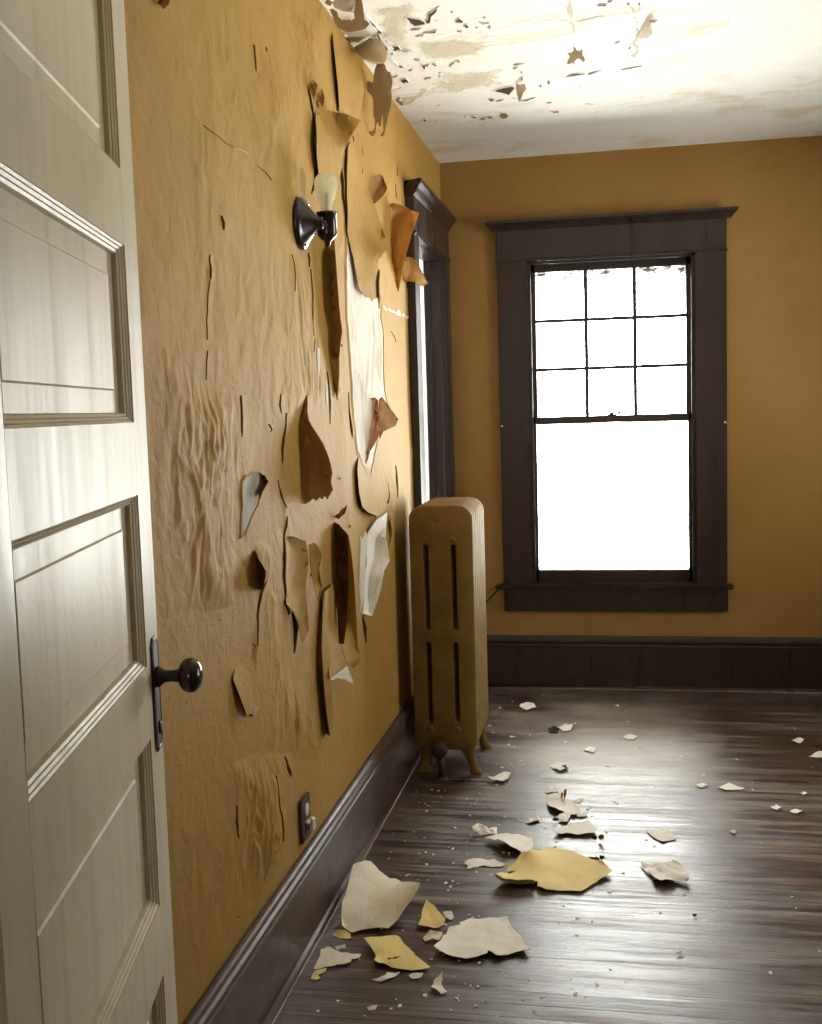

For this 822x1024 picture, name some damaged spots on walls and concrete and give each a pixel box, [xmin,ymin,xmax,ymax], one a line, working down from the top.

spalling [404,5,491,37]
spalling [389,44,461,84]
spalling [464,63,561,121]
spalling [567,47,585,65]
crack [203,125,277,184]
crack [206,255,216,380]
flaking render [286,35,428,736]
flaking render [239,471,268,539]
peeling [255,551,266,589]
peeling [233,620,257,716]
crack [276,752,297,842]